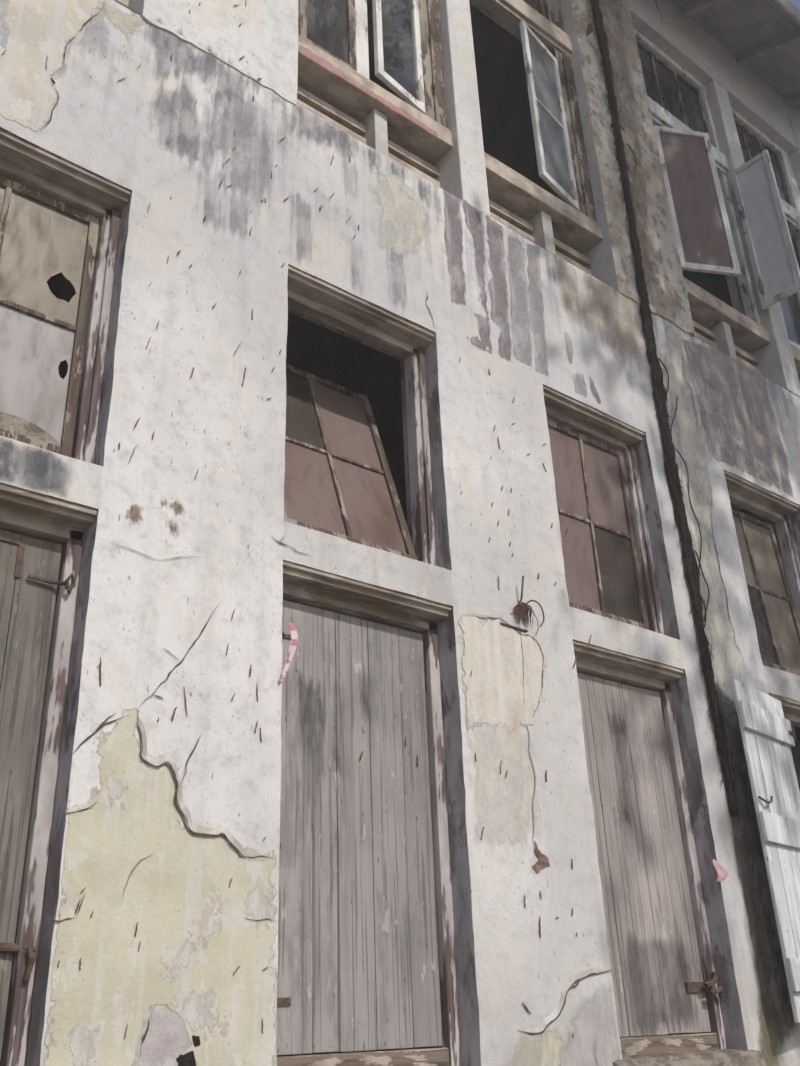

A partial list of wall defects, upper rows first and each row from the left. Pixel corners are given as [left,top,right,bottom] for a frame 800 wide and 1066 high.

peeling [0,0,143,131]
leakage [151,20,270,196]
leakage [293,106,351,153]
leakage [0,439,67,491]
rust [130,505,142,522]
crack [72,603,275,859]
peeling [459,613,550,873]
peeling [44,708,277,1066]
crack [522,971,606,1034]